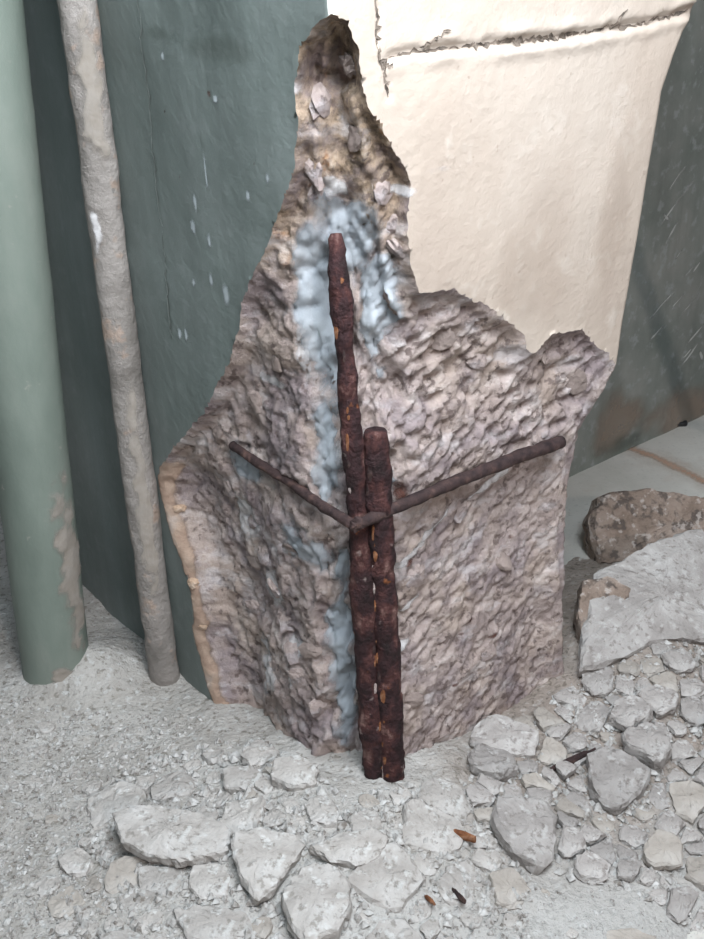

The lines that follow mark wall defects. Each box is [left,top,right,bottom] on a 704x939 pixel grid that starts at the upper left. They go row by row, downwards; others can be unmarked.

spalling [158,14,616,757]
crack [374,0,688,95]